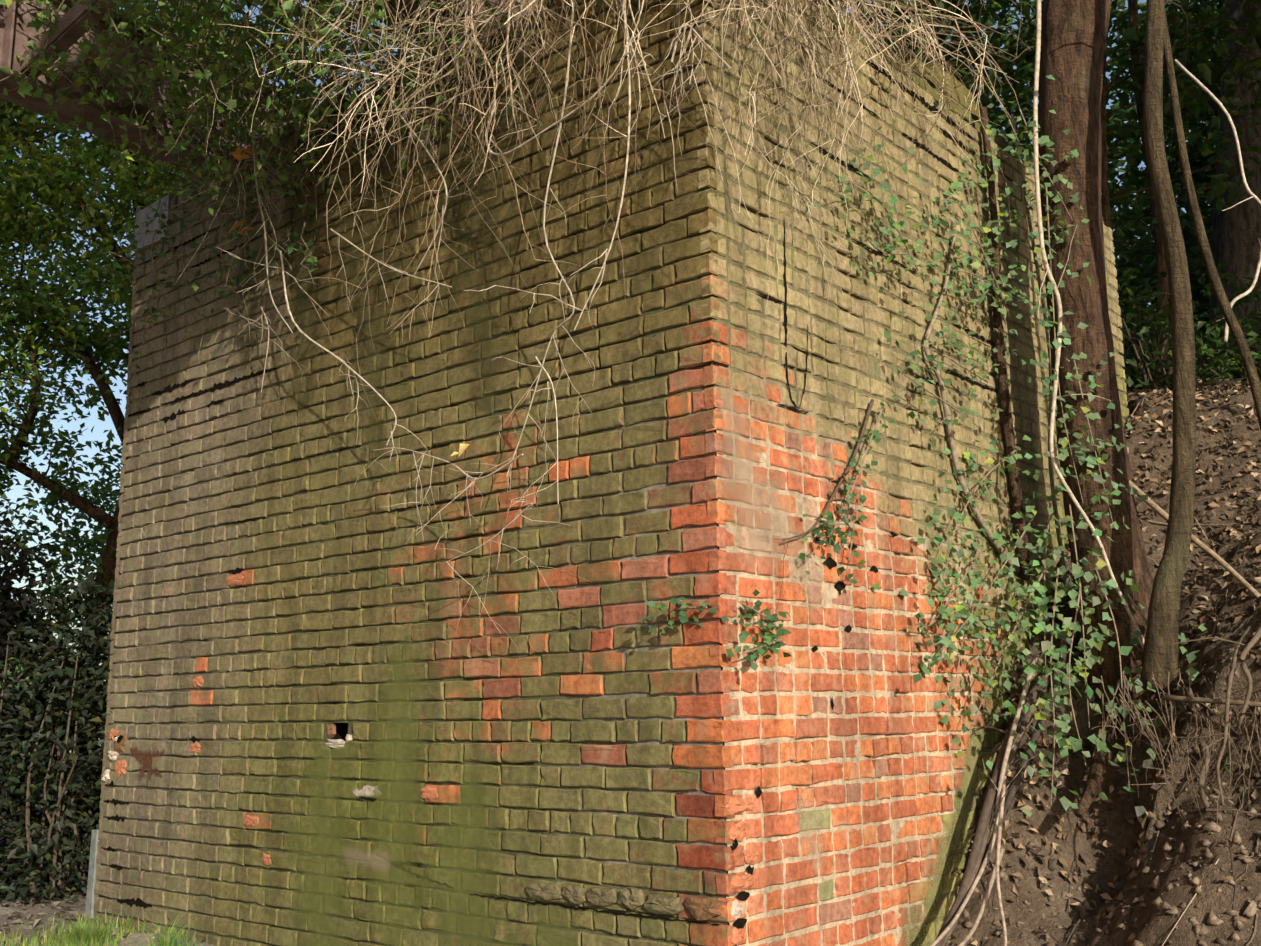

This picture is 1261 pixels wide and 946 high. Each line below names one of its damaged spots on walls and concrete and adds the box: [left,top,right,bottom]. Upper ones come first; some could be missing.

crack [757,219,808,413]
crack [128,368,276,423]
spalling [325,723,353,748]